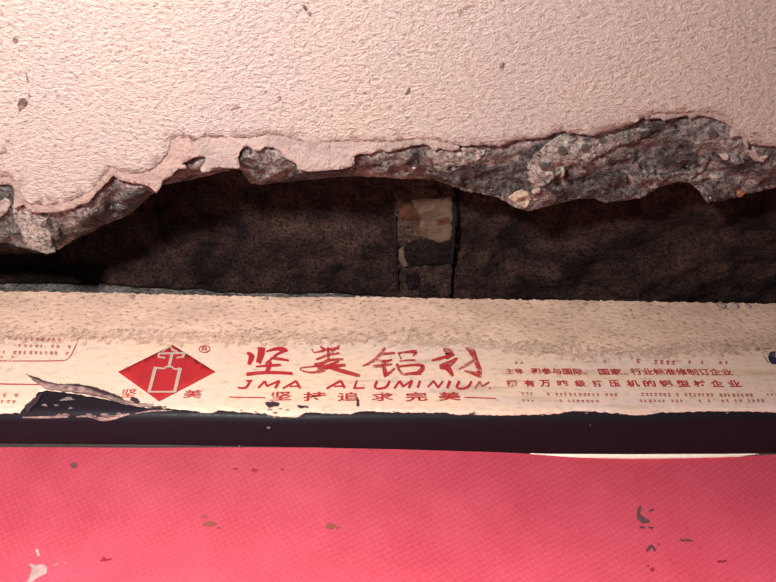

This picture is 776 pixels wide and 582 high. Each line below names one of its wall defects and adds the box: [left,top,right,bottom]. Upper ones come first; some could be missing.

spalling [0,111,776,255]